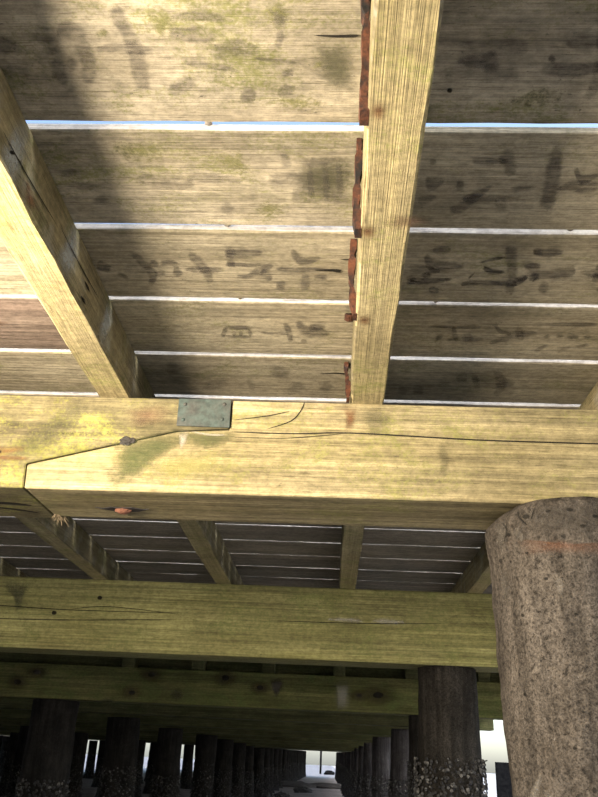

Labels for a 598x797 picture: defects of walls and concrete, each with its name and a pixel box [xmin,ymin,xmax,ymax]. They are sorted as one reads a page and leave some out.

crack [236,402,598,445]